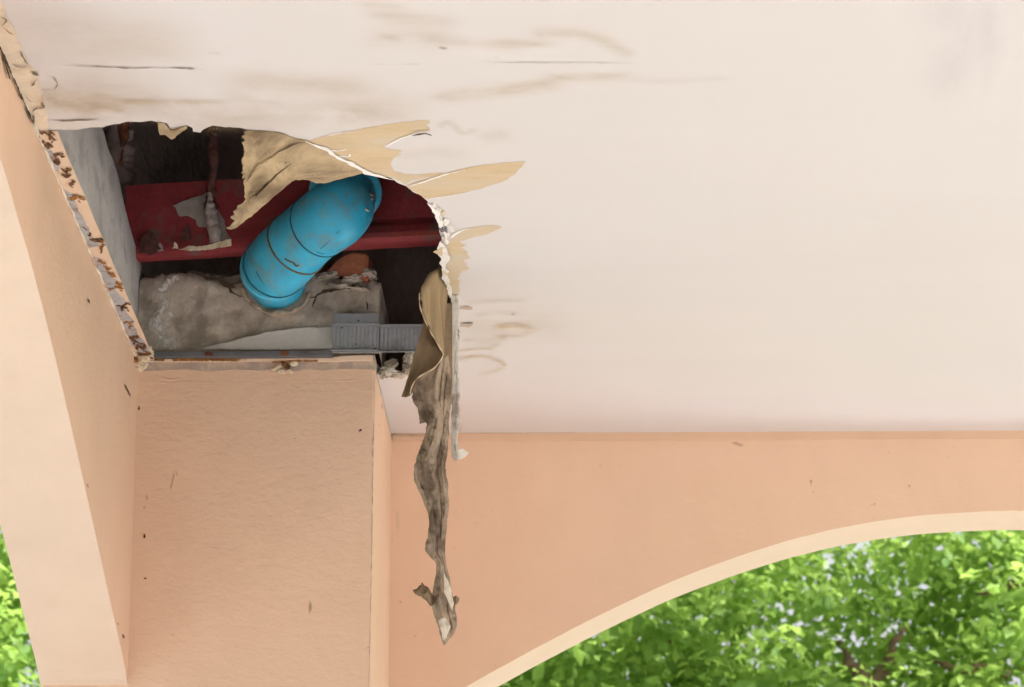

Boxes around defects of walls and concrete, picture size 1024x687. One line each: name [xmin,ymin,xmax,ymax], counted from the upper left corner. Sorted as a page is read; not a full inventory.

corrosion [39,130,85,203]
peeling [173,192,207,228]
peeling [297,120,526,328]
peeling [64,189,149,353]
spalling [377,352,414,379]